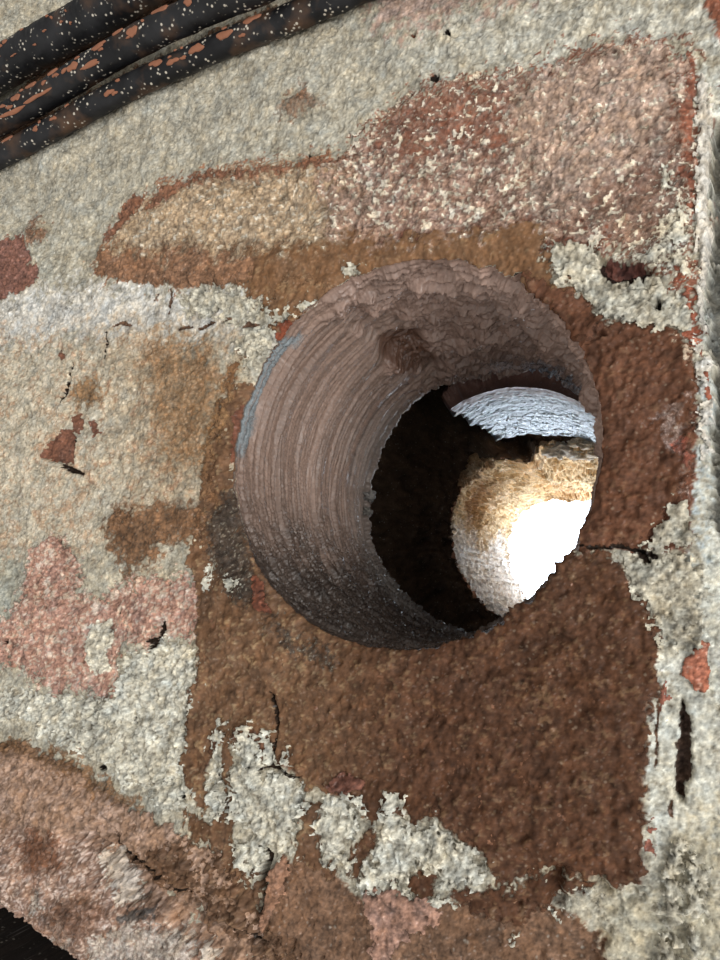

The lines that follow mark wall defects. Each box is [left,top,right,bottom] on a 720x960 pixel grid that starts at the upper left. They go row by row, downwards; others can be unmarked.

spalling [0,232,39,300]
peeling [341,260,366,278]
peeling [541,51,718,468]
peeling [178,282,317,376]
spalling [40,413,102,465]
spalling [230,404,245,463]
crack [579,543,658,563]
peeling [614,493,714,693]
spalling [0,530,488,960]
crack [257,692,300,779]
spalling [658,680,672,713]
crack [654,690,693,817]